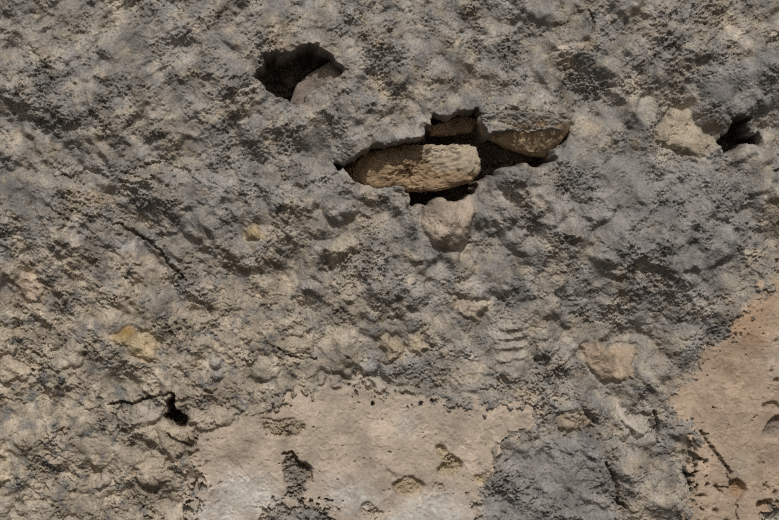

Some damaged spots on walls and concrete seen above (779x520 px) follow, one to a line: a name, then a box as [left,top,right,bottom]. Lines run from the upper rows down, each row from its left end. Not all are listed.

crack [114,222,185,279]
crack [107,391,171,406]